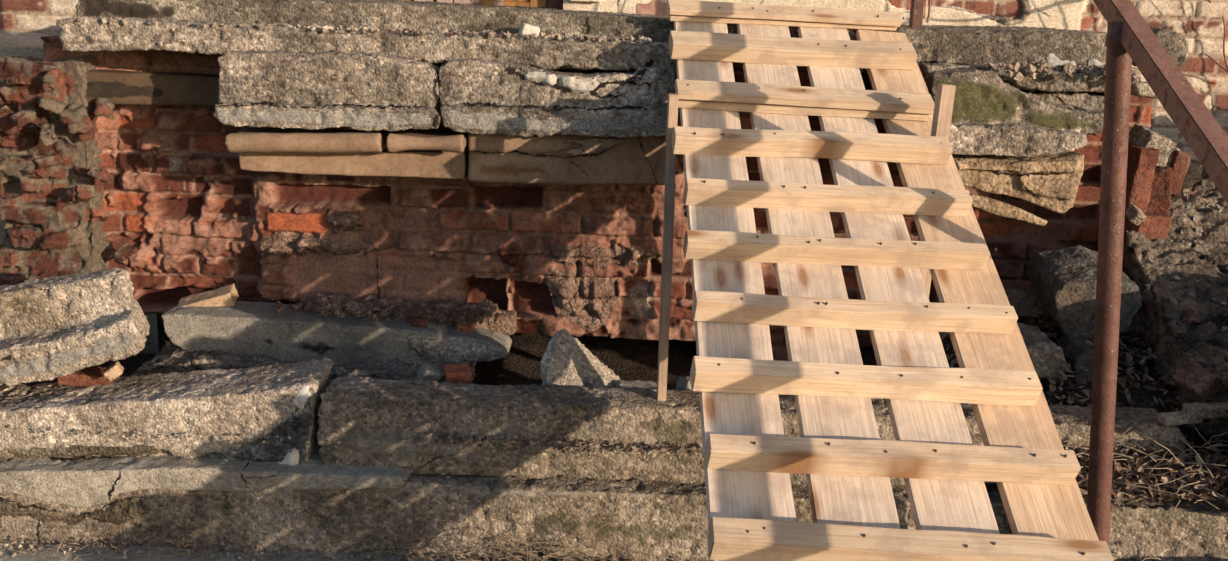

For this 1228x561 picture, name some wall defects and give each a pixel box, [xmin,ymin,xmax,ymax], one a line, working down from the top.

flaking render [885,0,1031,26]
crack [215,59,653,128]
crack [471,149,609,180]
crack [52,455,129,500]